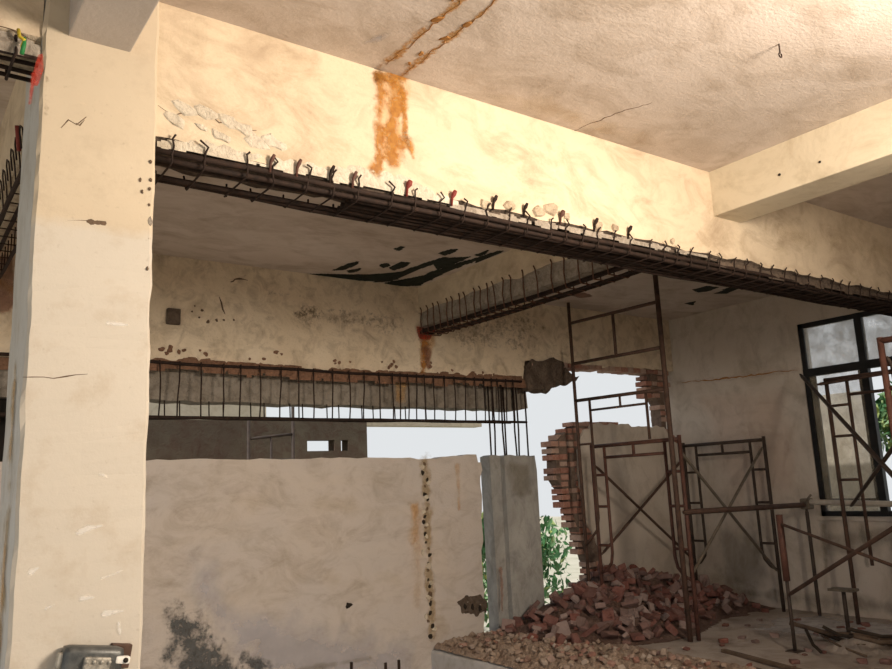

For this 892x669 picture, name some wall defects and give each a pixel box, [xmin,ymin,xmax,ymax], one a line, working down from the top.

spalling [0,26,42,83]
corrosion [370,71,414,174]
spalling [0,168,21,279]
spalling [139,99,892,335]
spalling [0,352,9,370]
spalling [149,345,579,394]
corrosion [417,327,435,373]
damp [163,612,269,669]